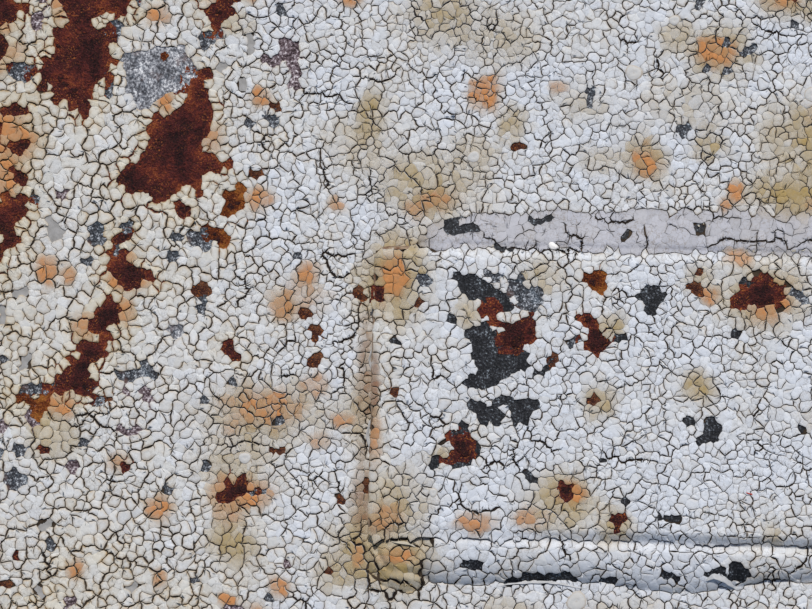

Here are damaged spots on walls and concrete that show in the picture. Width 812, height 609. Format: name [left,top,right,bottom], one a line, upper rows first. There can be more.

corrosion [24,0,168,129]
crack [91,12,115,30]
peeling [102,19,223,112]
corrosion [0,100,40,274]
corrosion [106,61,273,255]
corrosion [14,227,165,422]
crack [490,325,506,333]
peeling [453,268,547,317]
crack [496,296,529,324]
peeling [428,321,561,473]
peeling [682,415,723,446]
crack [730,580,812,609]